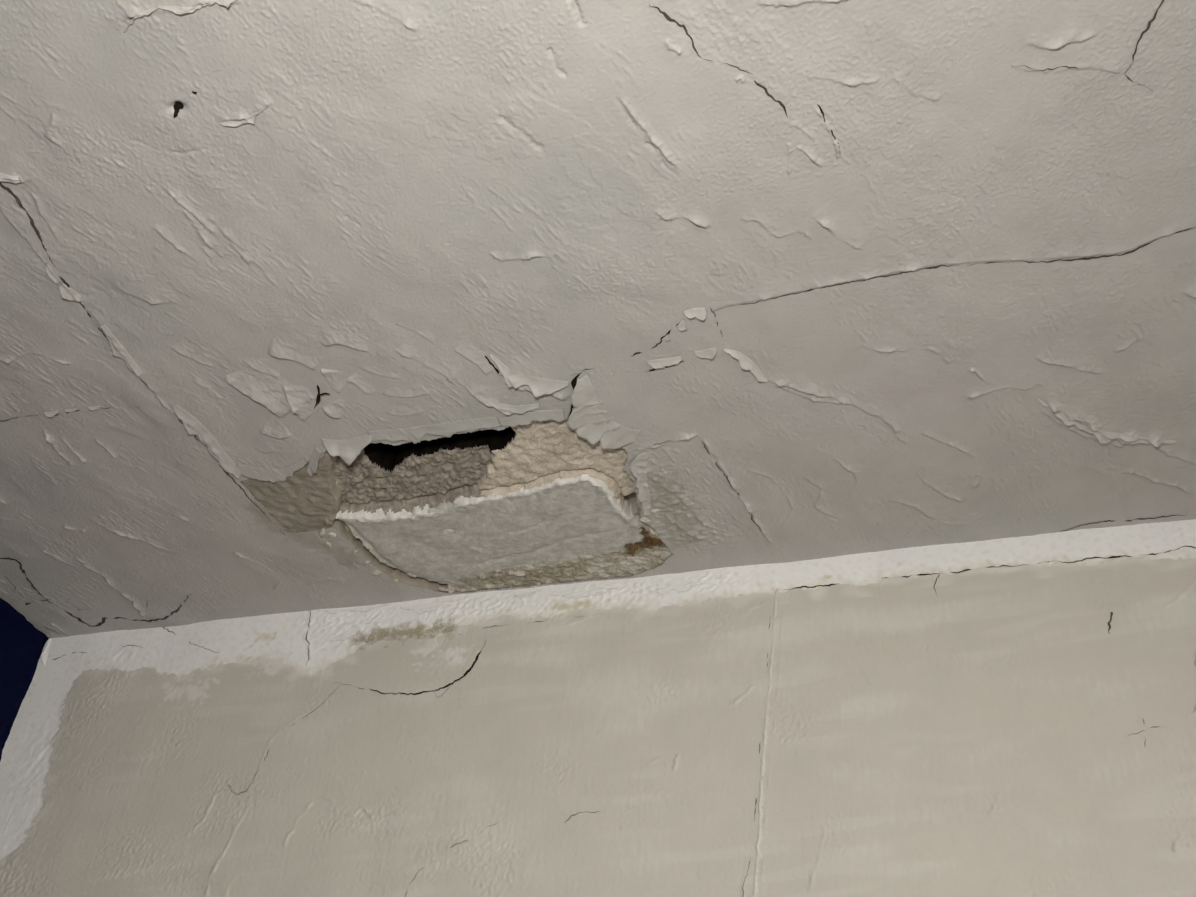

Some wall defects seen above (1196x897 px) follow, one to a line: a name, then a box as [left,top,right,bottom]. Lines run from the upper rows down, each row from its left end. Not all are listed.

crack [1125,0,1164,91]
crack [0,172,148,422]
crack [633,324,684,371]
crack [710,228,1193,338]
crack [172,404,284,534]
spalling [236,354,674,594]
crack [0,558,221,660]
crack [291,621,544,726]